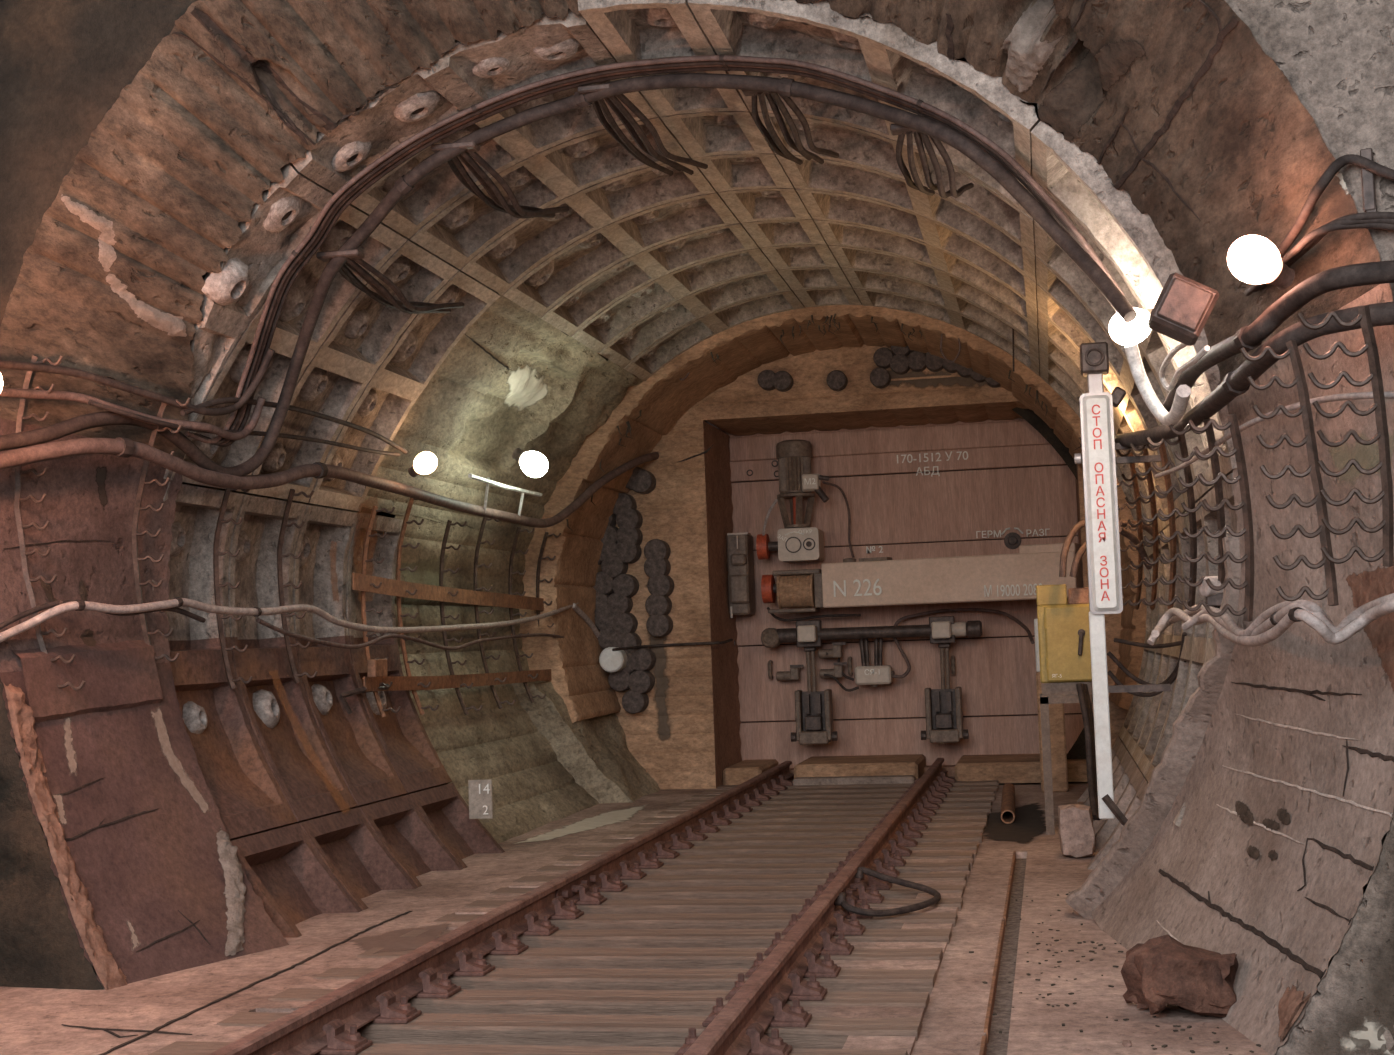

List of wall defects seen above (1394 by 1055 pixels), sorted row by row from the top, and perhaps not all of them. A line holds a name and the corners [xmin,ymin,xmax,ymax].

spalling [1001,0,1146,143]
crack [1231,682,1362,701]
crack [52,777,106,798]
crack [1342,739,1394,797]
crack [64,808,159,841]
crack [1297,838,1374,925]
crack [1158,869,1326,980]
spalling [1278,985,1311,1042]